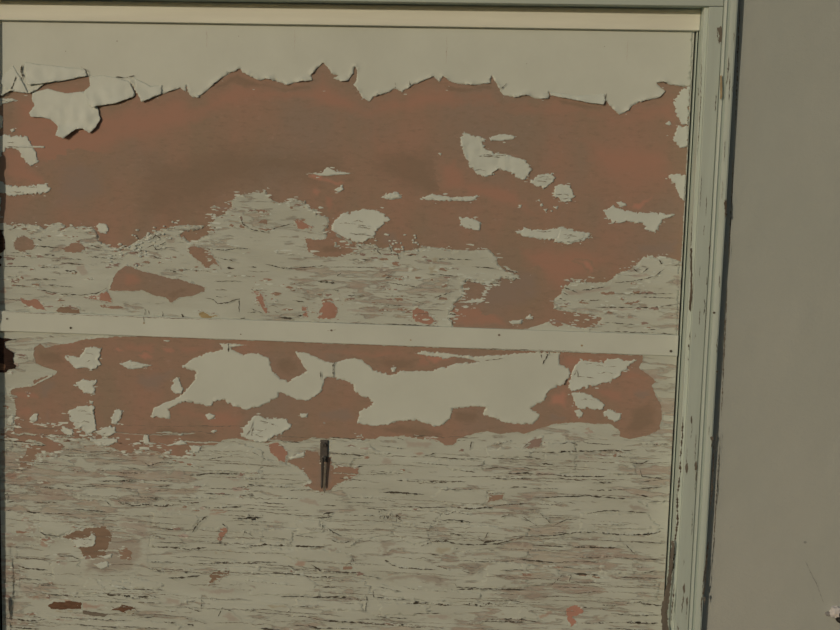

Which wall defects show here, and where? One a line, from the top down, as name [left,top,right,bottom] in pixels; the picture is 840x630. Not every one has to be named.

peeling [0,85,693,330]
peeling [0,335,675,630]
crack [2,410,719,630]